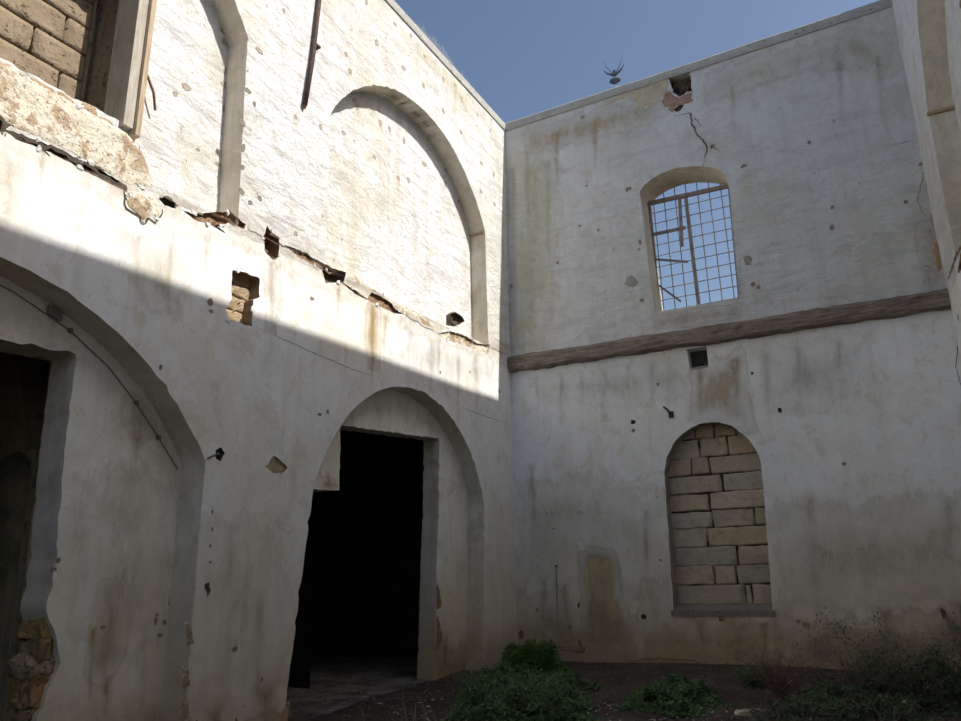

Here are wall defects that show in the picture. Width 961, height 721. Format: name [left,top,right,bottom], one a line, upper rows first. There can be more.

flaking render [600,73,694,112]
flaking render [0,62,246,233]
crack [678,113,718,164]
spalling [225,268,260,327]
spalling [261,226,490,355]
crack [947,245,961,282]
spalling [265,456,287,476]
damp [587,554,620,641]
spalling [2,616,55,721]